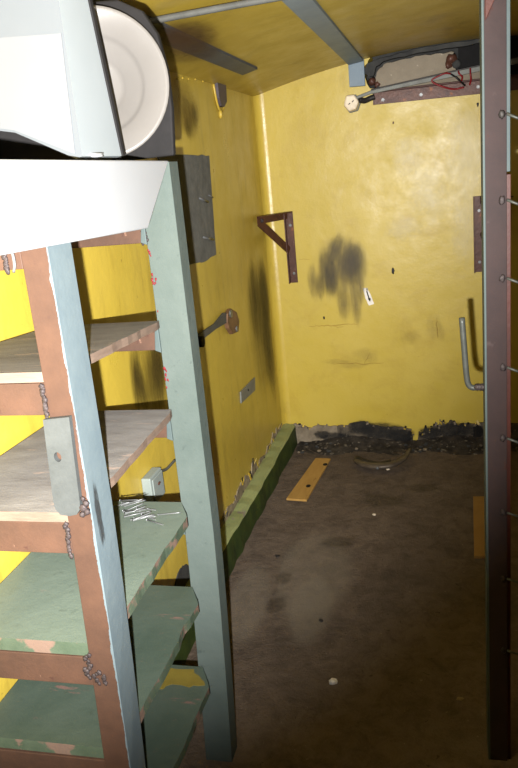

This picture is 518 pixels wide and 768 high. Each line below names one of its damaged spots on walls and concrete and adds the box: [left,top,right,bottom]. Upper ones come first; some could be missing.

leakage [252,279,273,372]
peeling [293,419,484,456]